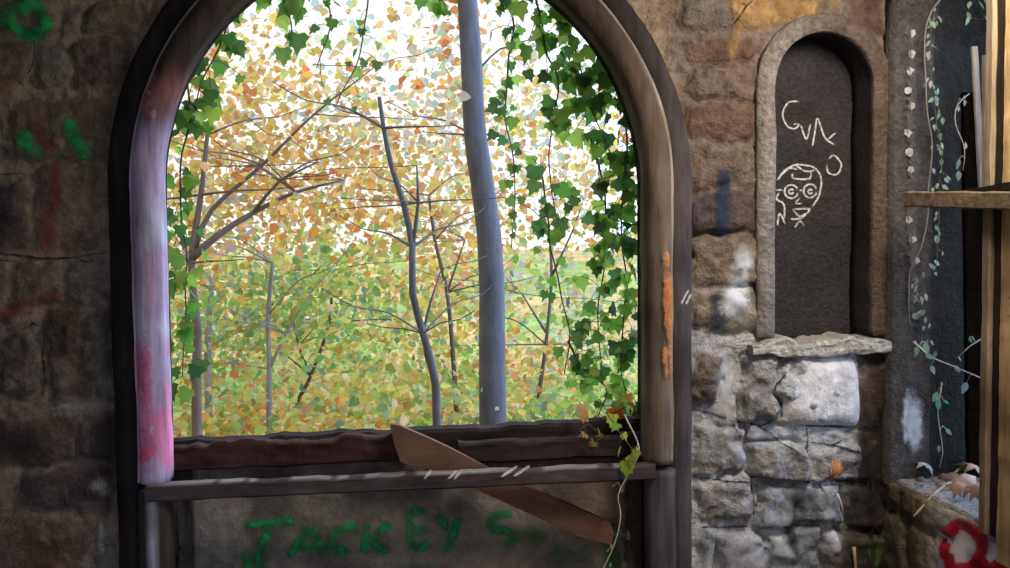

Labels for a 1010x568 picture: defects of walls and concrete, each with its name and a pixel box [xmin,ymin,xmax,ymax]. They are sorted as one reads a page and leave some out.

rust [663,251,673,385]
crack [692,375,879,529]